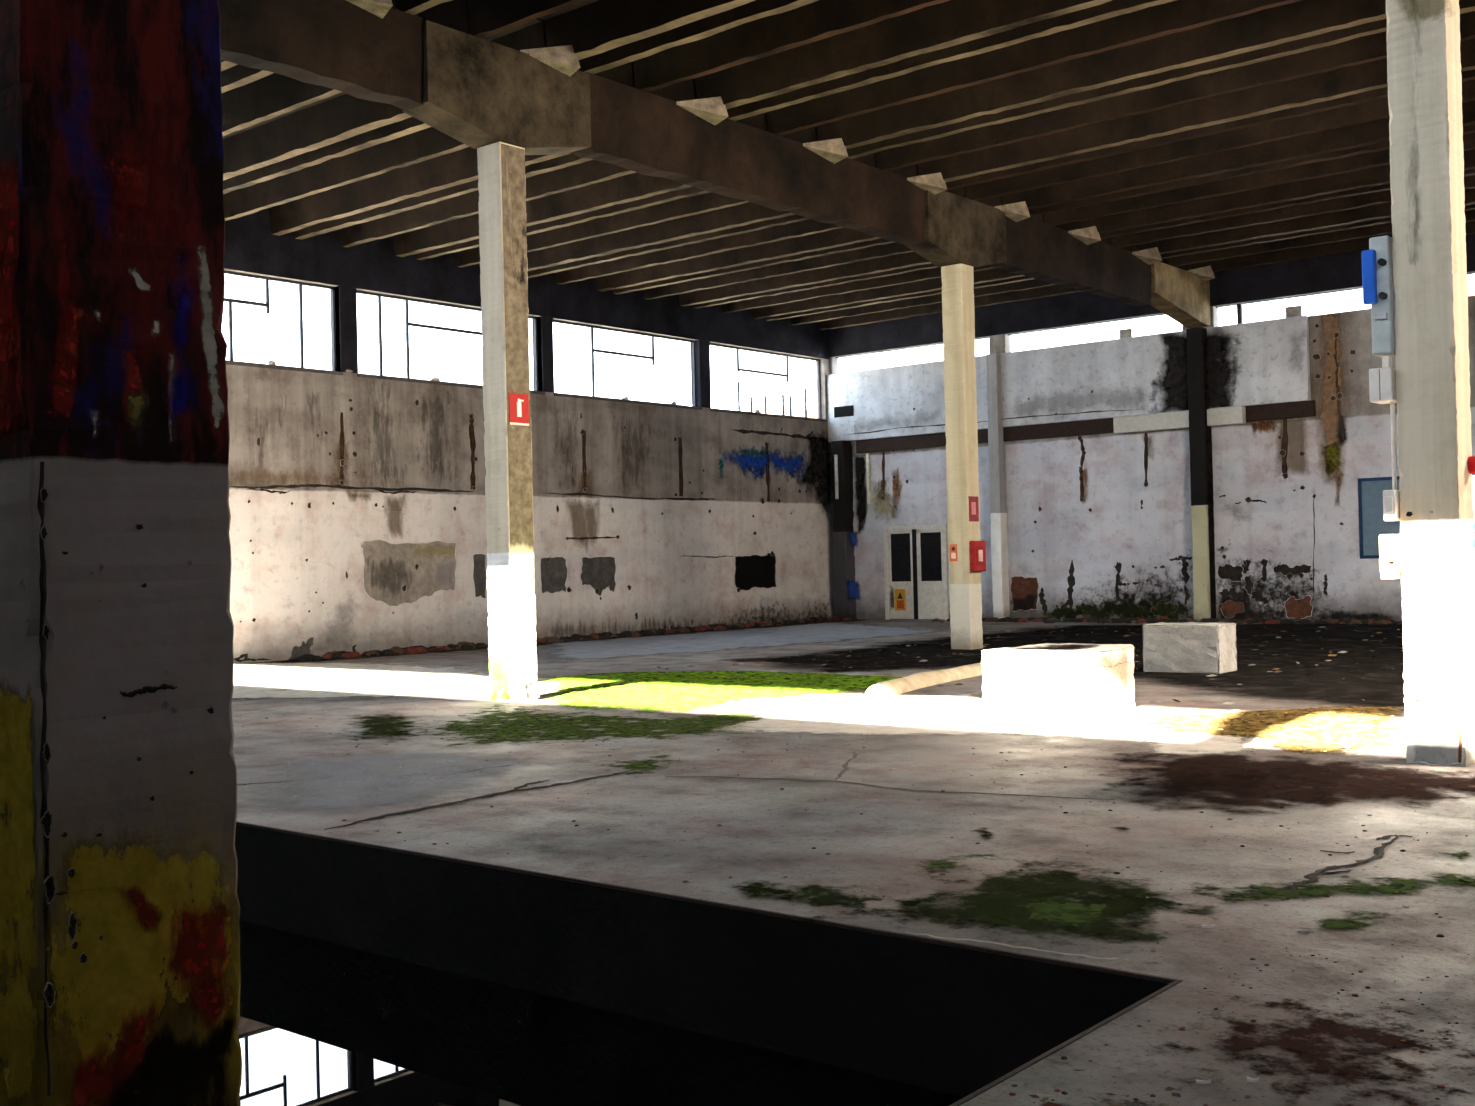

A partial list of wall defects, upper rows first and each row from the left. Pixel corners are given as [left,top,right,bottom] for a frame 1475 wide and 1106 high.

flaking render [345,540,486,615]
crack [1237,834,1412,896]